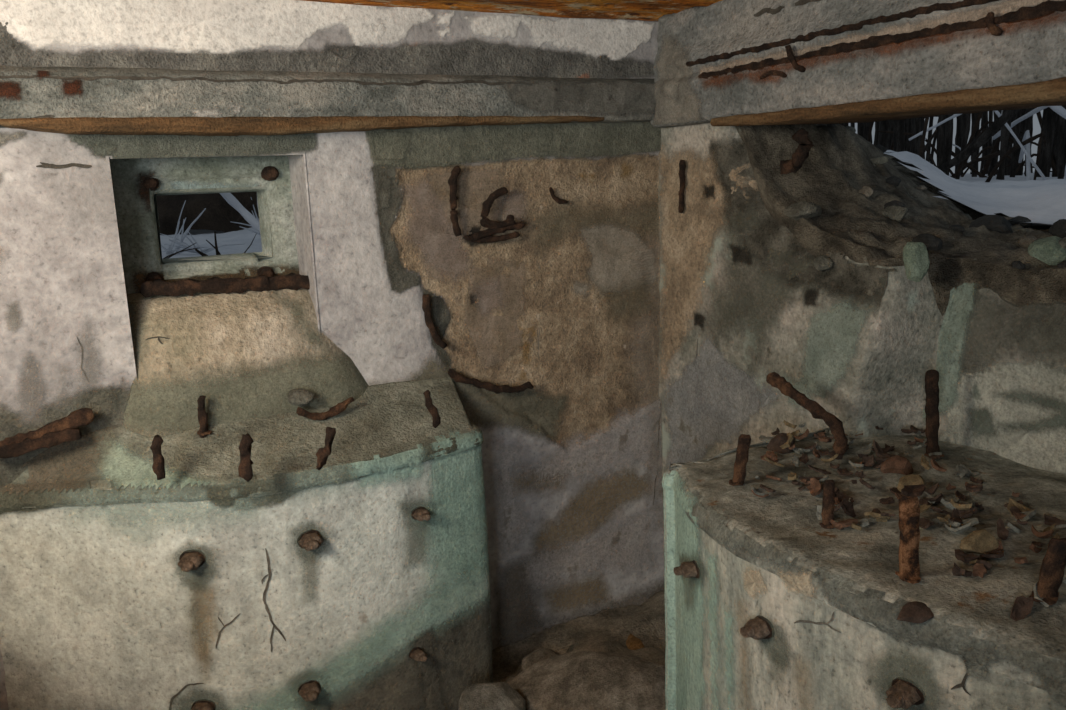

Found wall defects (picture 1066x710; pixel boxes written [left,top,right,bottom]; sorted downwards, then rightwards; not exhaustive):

corrosion [133,266,310,298]
spalling [371,128,896,455]
peeling [936,283,1066,474]
corrosion [0,408,94,458]
crack [216,614,240,647]
crack [261,548,286,652]
spalling [677,476,1066,707]